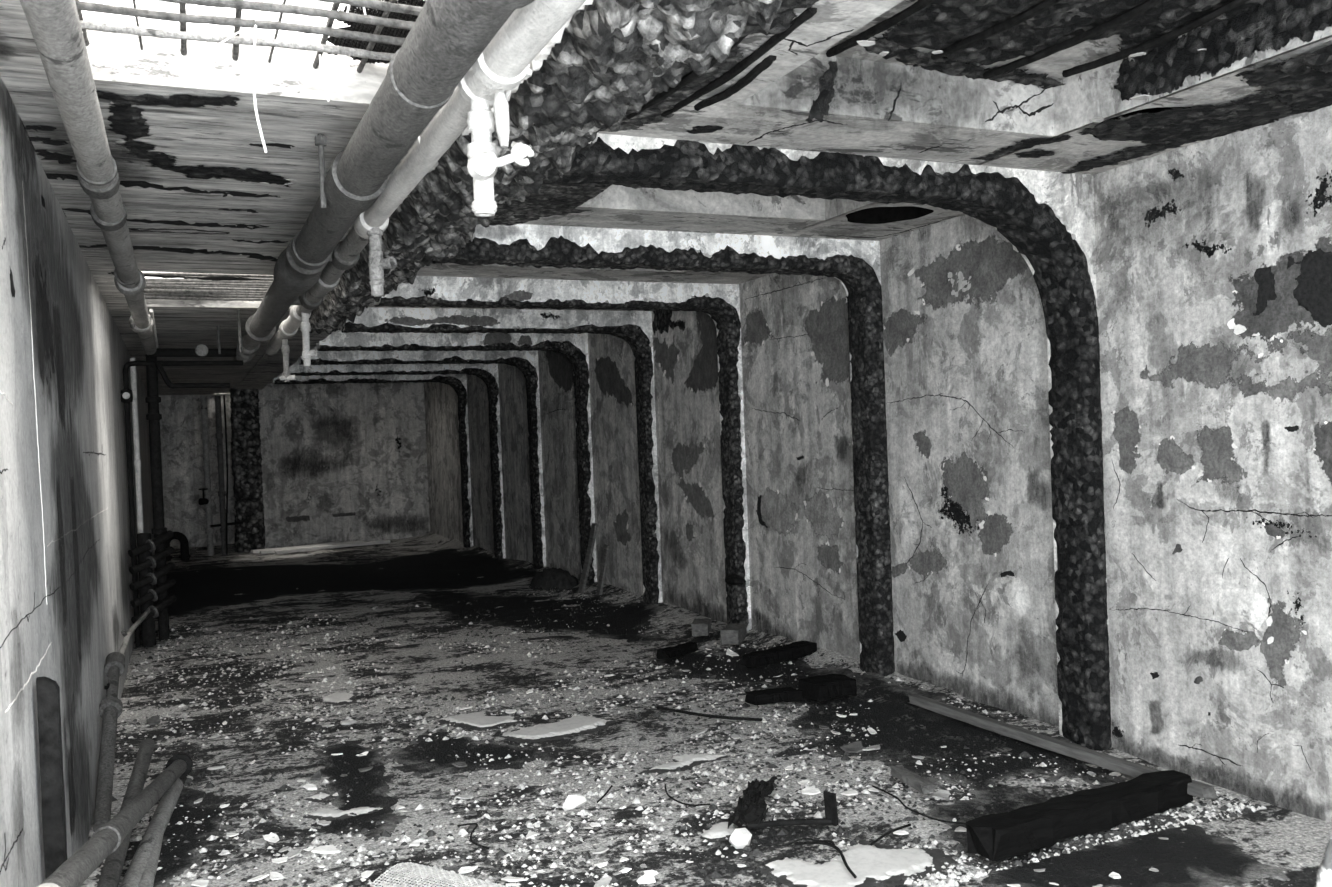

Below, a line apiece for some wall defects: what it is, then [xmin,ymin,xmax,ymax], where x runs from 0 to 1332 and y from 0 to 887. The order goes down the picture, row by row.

leakage [106,134,152,180]
crack [985,88,1054,122]
spalling [273,0,1332,751]
leakage [0,83,98,838]
crack [0,291,104,712]
crack [1110,499,1331,634]
crack [0,828,23,874]